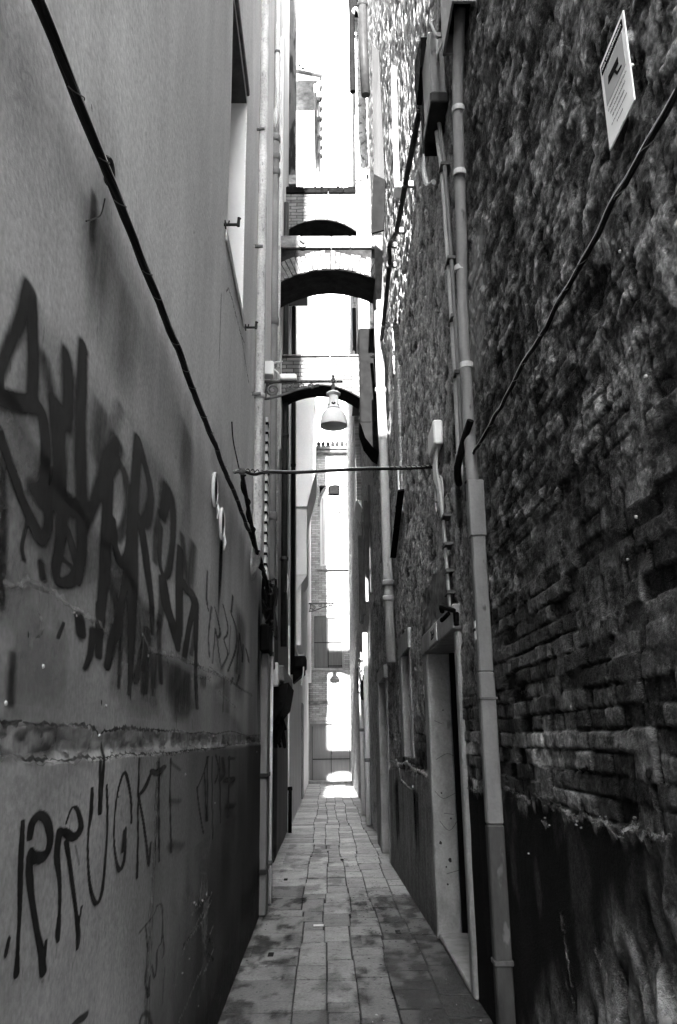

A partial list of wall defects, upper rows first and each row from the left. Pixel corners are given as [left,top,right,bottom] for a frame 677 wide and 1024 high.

crack [0,720,259,763]